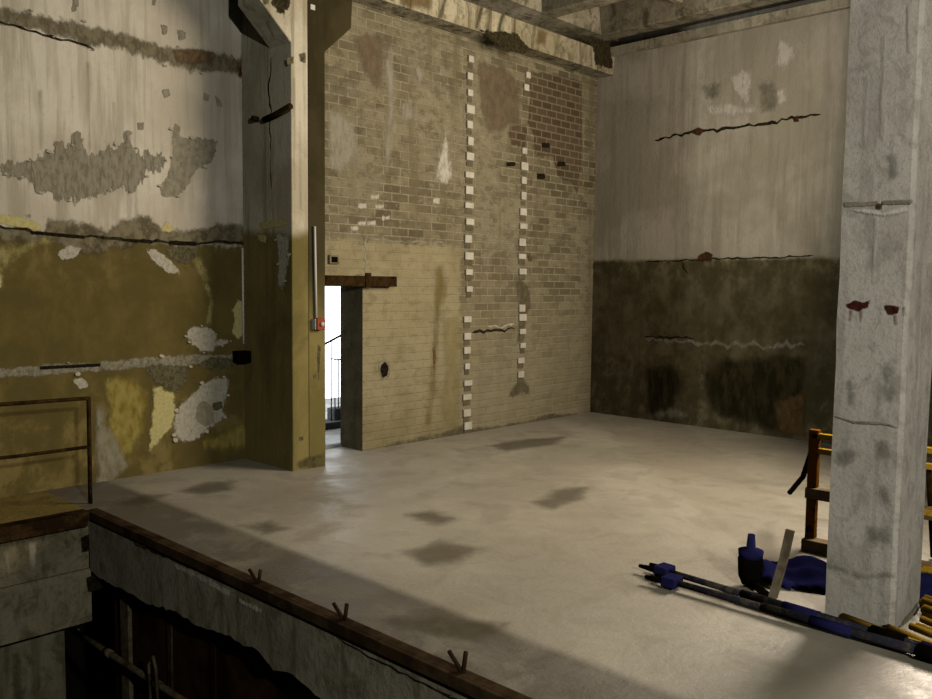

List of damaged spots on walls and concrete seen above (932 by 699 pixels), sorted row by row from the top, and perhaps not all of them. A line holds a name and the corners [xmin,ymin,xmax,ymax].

spalling [263,0,290,18]
crack [266,70,274,187]
crack [655,114,821,141]
flaking render [1,122,217,203]
crack [473,323,515,334]
rust [847,300,869,320]
rust [885,305,905,324]
flaking render [0,247,245,482]
crack [135,543,234,587]
crack [338,637,475,699]